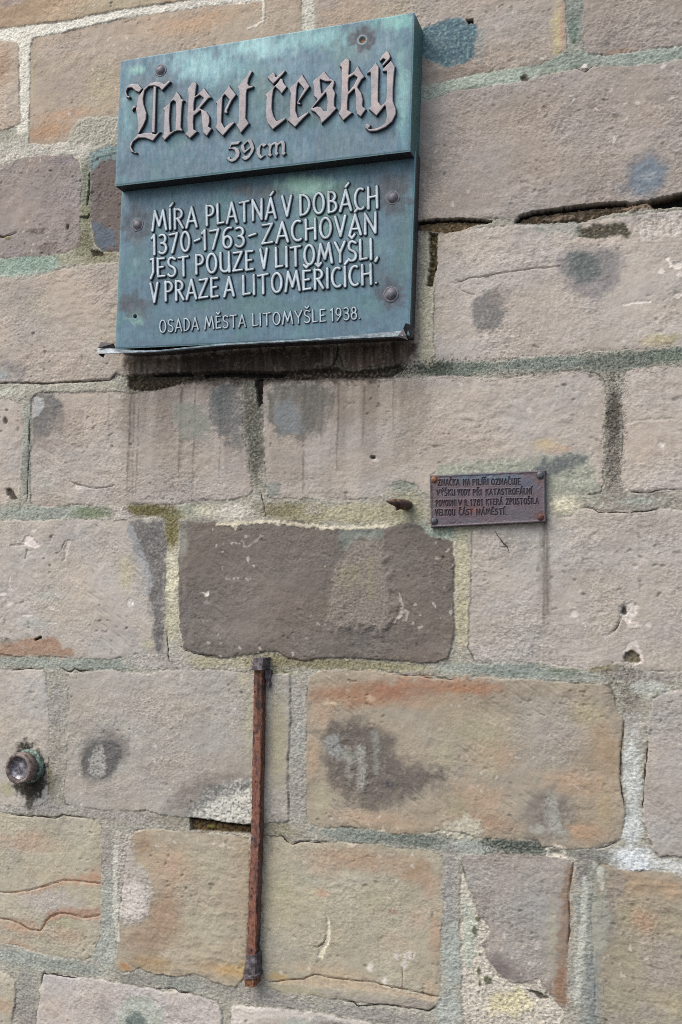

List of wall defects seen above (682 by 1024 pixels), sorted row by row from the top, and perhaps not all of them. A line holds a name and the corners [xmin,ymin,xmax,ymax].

leakage [422,15,486,69]
leakage [469,274,521,333]
crack [418,192,682,294]
leakage [533,222,628,303]
leakage [124,517,171,659]
leakage [76,725,135,789]
leakage [310,708,457,818]
spalling [457,868,565,1024]